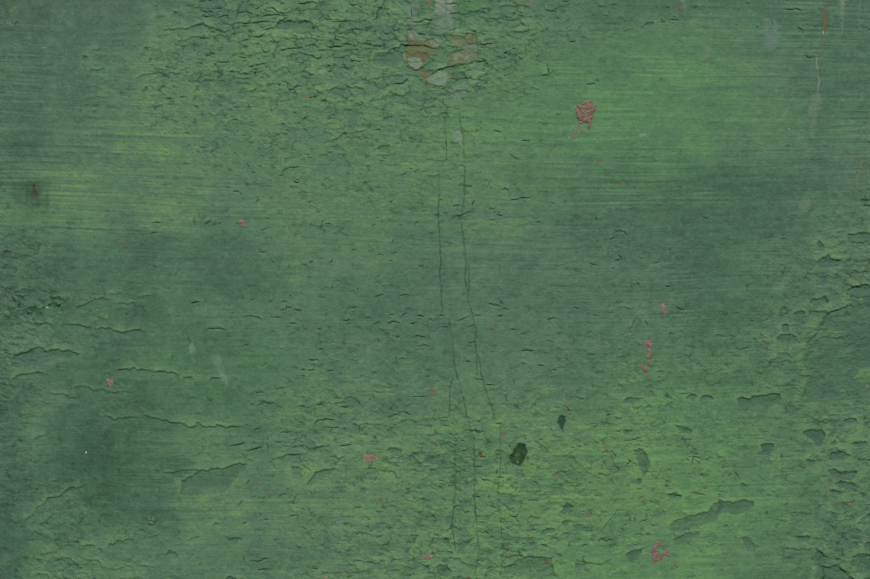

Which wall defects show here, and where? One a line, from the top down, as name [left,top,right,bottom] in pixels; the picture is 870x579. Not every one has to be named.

peeling [389,27,486,89]
crack [159,0,710,579]
peeling [0,346,82,388]
peeling [791,280,870,410]
peeling [163,460,249,499]
peeling [506,440,530,468]
peeling [803,438,870,518]
peeling [663,497,756,548]
peeling [782,544,870,579]